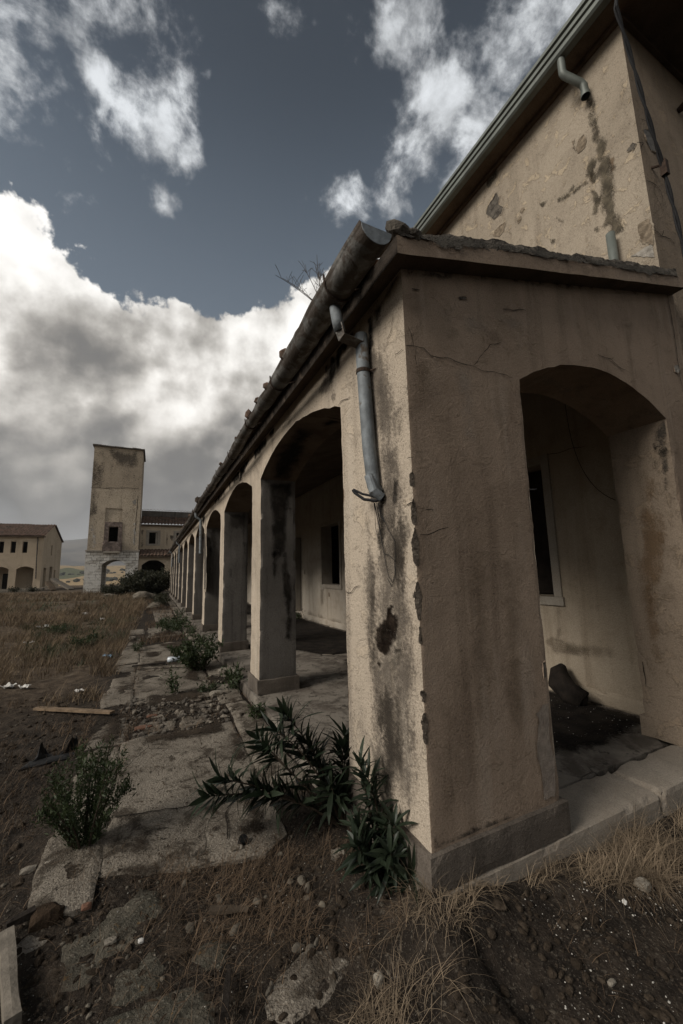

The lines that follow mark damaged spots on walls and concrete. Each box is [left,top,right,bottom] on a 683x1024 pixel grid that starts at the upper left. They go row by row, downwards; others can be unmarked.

flaking render [572,134,587,154]
water stain [540,99,623,234]
flaking render [486,192,525,237]
crack [386,320,513,378]
water stain [270,483,292,639]
water stain [365,307,417,805]
flaking render [409,472,419,566]
flaking render [413,582,422,644]